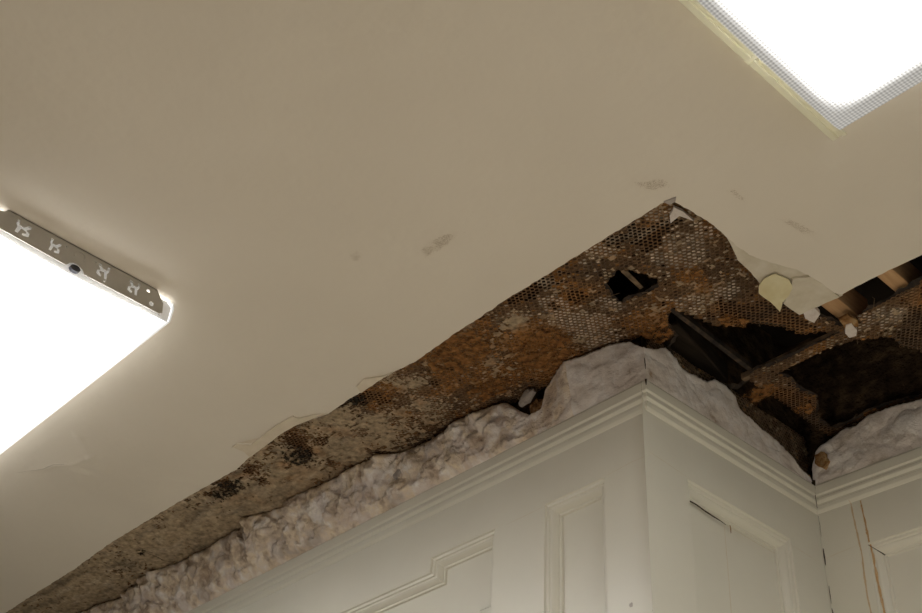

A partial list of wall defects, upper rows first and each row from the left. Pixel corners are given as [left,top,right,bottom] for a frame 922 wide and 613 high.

flaking render [664,197,694,223]
rust [642,320,674,344]
flaking render [804,307,820,323]
flaking render [839,313,859,338]
damp [277,446,312,467]
flaking render [81,342,922,613]
damp [209,479,242,502]